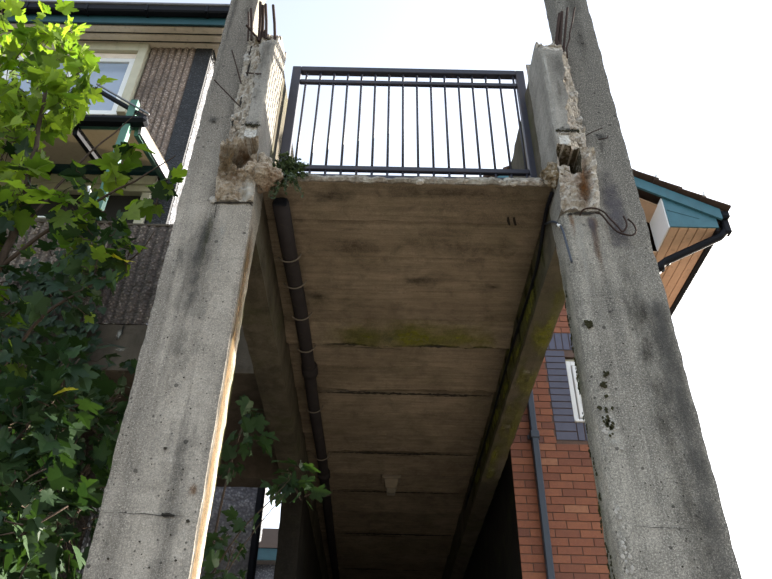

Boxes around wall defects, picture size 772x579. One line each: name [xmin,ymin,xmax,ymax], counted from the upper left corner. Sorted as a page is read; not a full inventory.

spalling [209,34,286,203]
spalling [294,41,600,212]
spalling [597,394,620,439]
crack [104,510,177,518]